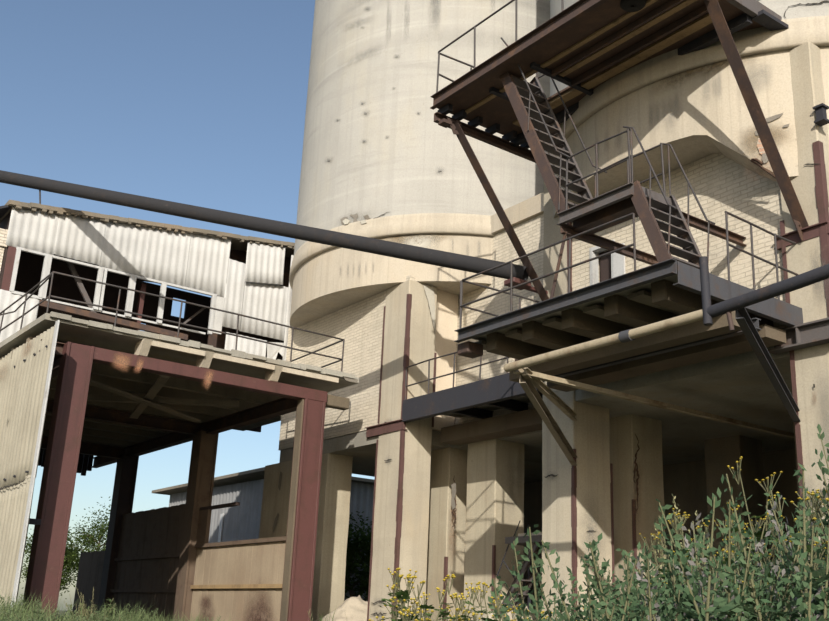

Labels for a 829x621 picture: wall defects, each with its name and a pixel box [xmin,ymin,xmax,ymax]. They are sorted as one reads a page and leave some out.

crack [784,0,829,18]
spalling [766,113,789,138]
spalling [746,131,776,179]
crack [632,434,640,512]